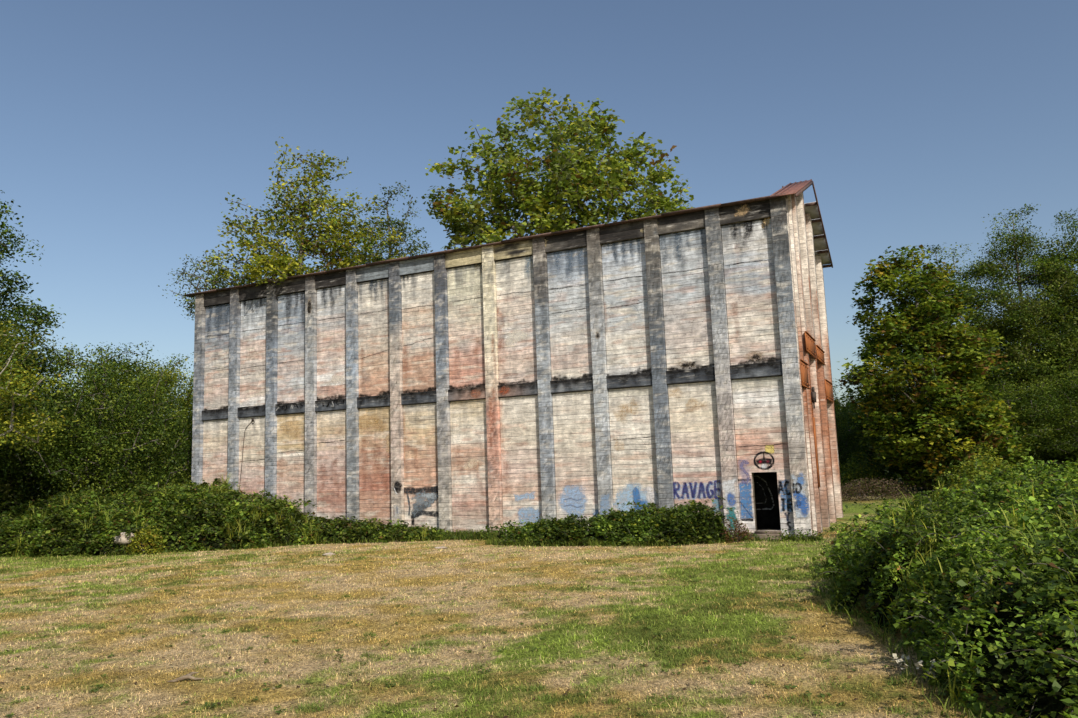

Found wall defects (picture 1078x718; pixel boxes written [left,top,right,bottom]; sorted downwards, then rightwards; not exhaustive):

leakage [731,219,766,245]